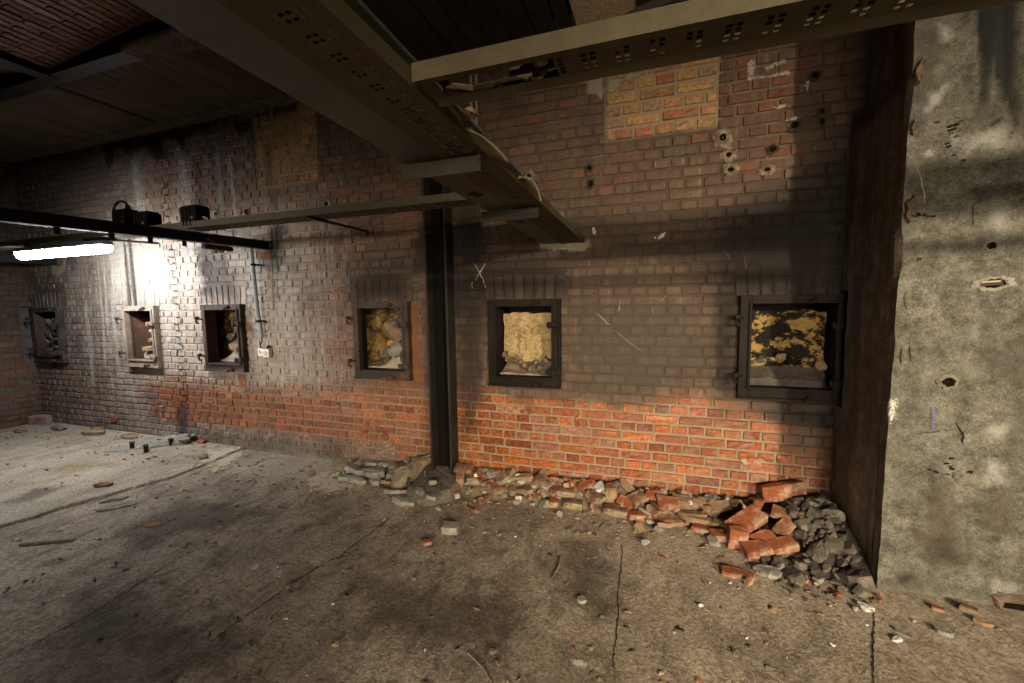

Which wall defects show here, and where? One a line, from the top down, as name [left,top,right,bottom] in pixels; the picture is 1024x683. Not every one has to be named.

spalling [971,275,1017,292]
crack [212,515,392,641]
crack [613,542,623,680]